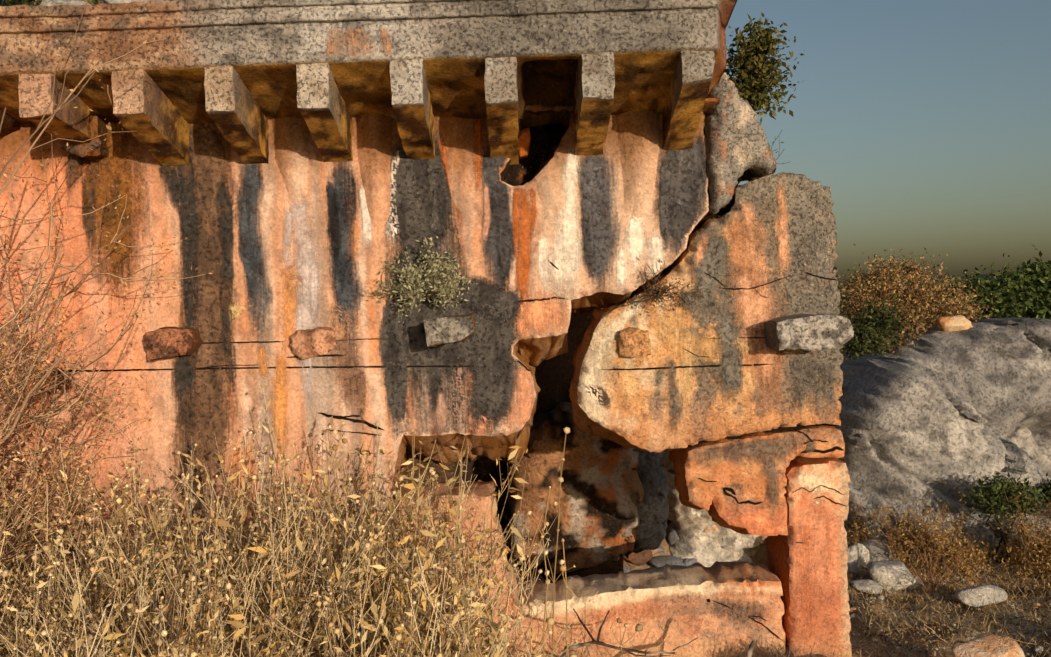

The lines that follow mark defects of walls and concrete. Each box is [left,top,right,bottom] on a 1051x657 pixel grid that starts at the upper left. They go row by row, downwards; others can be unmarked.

peeling [518,127,531,160]
crack [618,170,746,302]
crack [704,272,837,298]
rust [258,269,296,453]
crack [600,337,775,370]
spalling [587,386,610,407]
crack [669,423,844,454]
crack [698,478,762,505]
crack [794,485,846,506]